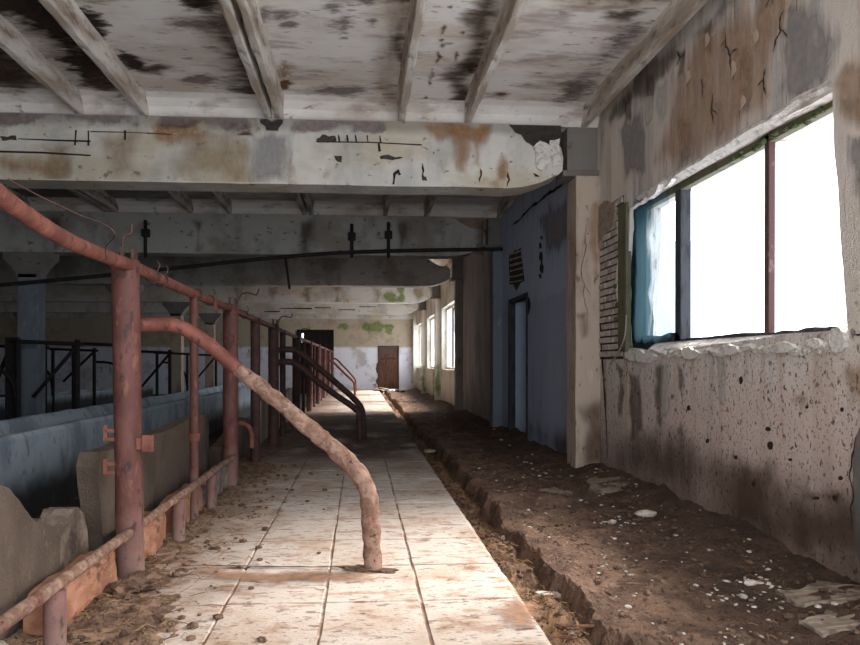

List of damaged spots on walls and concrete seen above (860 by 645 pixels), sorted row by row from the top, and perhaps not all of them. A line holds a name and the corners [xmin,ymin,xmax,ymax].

damp [0,0,115,91]
damp [117,51,167,74]
damp [174,0,255,94]
damp [443,0,495,101]
crack [721,33,738,80]
crack [757,0,787,95]
rust [430,123,490,167]
spalling [509,124,562,171]
crack [513,173,563,225]
peeling [509,247,525,291]
flaking render [598,195,624,359]
peeling [838,428,860,562]